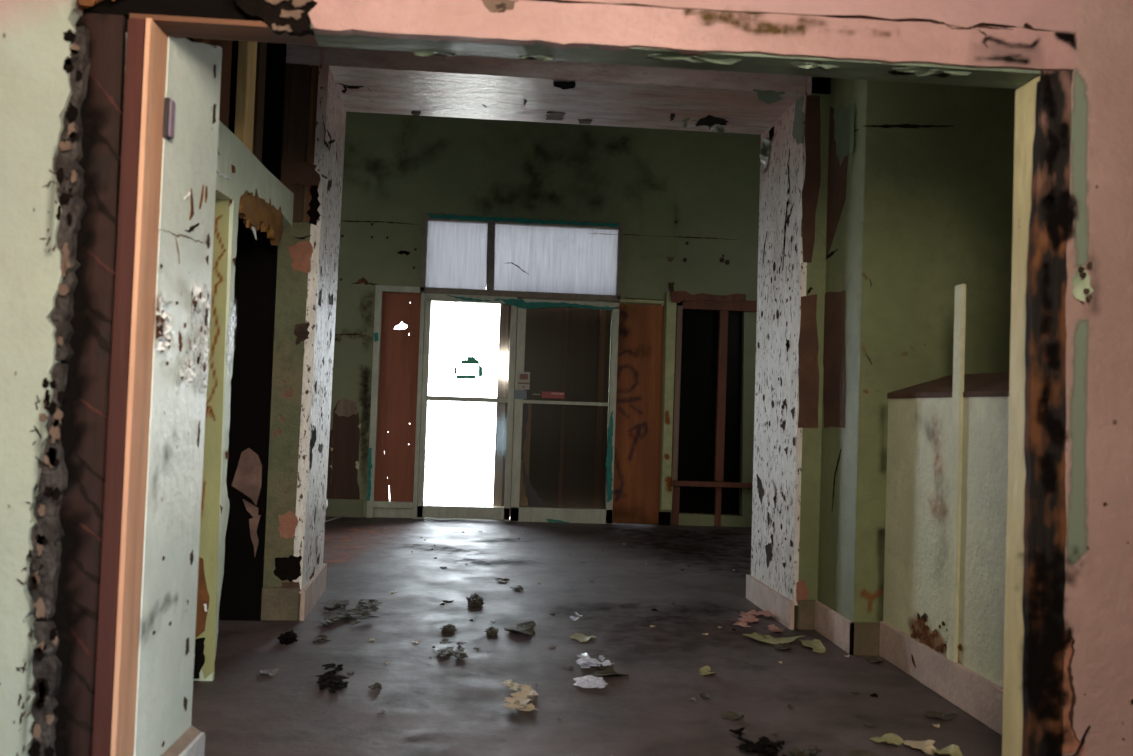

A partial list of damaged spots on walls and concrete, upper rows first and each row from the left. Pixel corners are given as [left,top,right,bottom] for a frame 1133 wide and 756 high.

flaking render [78,0,115,9]
flaking render [235,0,315,37]
peeling [887,67,971,78]
crack [158,229,203,264]
peeling [752,95,848,602]
flaking render [273,158,379,592]
peeling [910,612,963,653]
peeling [1062,627,1091,756]